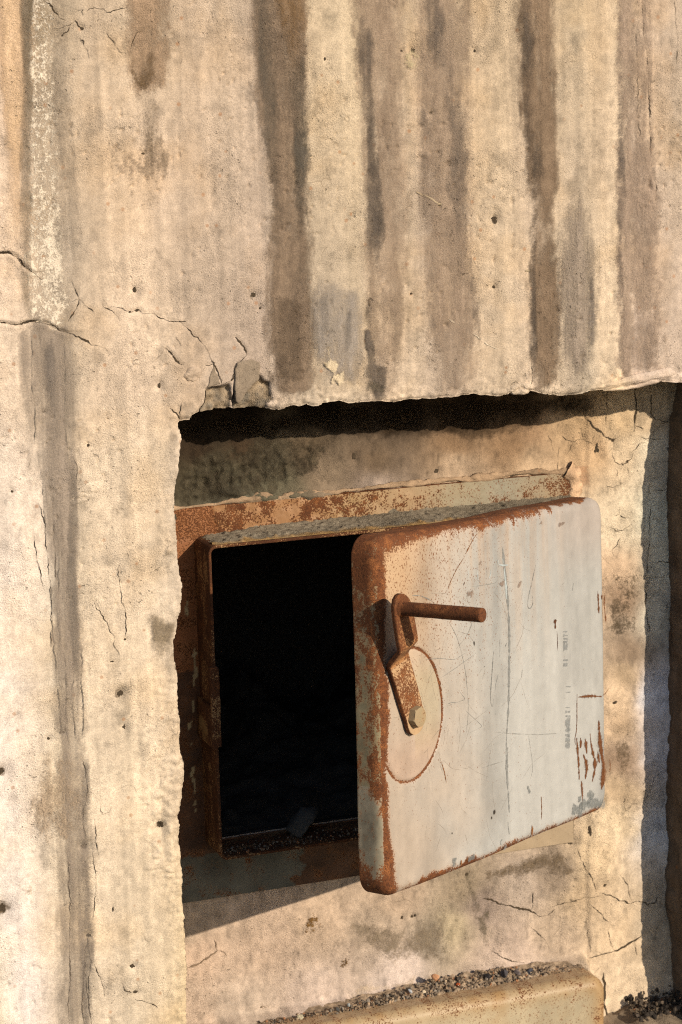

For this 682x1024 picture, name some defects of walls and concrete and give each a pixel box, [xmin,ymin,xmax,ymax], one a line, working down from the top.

damp [253,0,405,400]
damp [518,0,599,387]
damp [617,0,661,377]
crack [1,279,247,388]
flaking render [200,359,273,412]
damp [21,0,93,1020]
crack [549,389,669,631]
corrosion [575,722,611,800]
crack [484,850,657,1015]